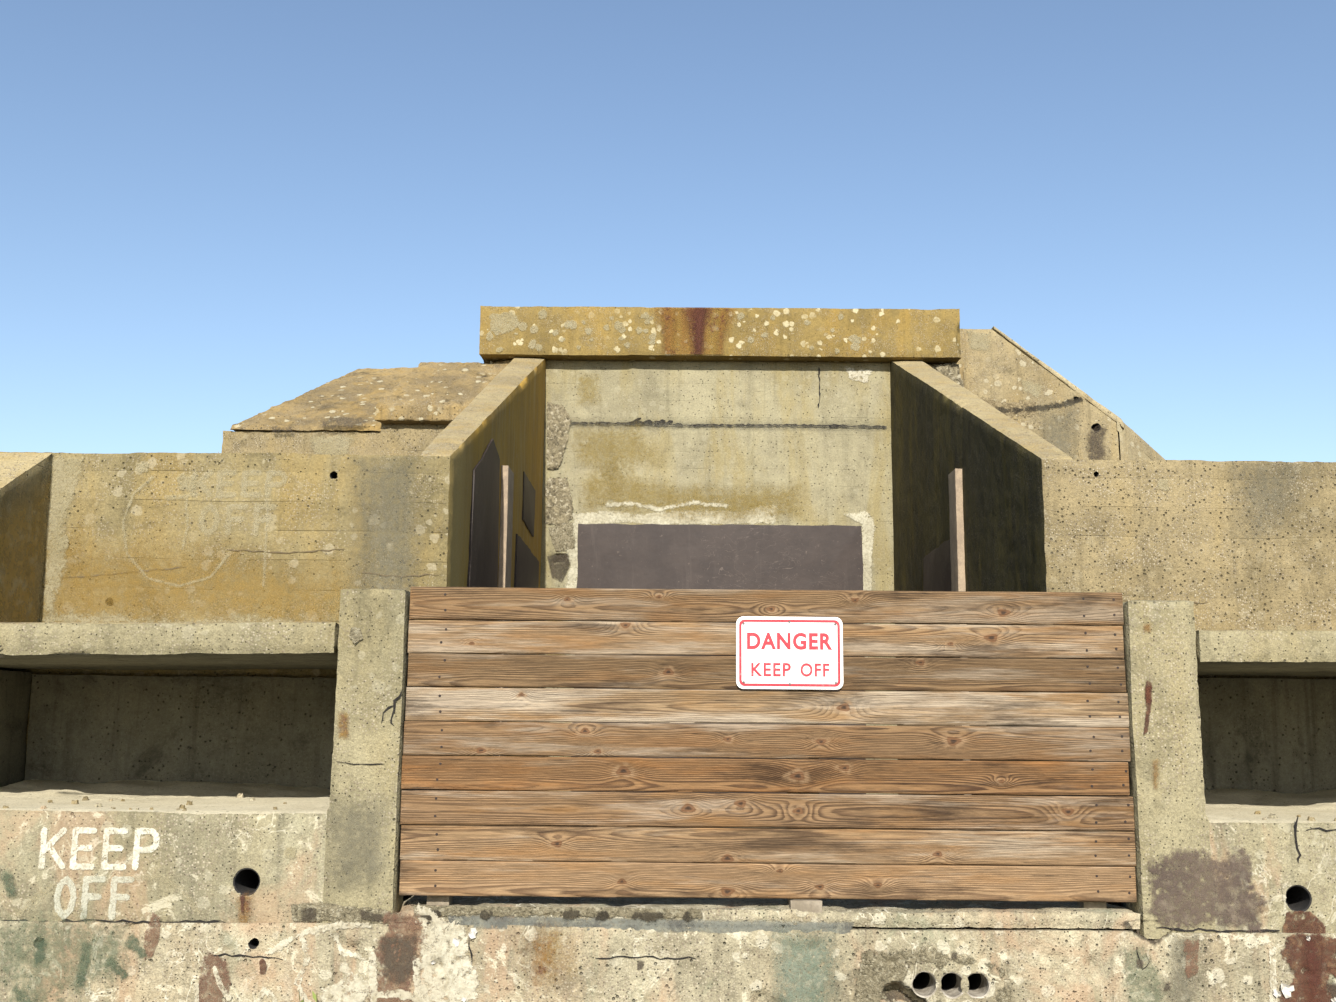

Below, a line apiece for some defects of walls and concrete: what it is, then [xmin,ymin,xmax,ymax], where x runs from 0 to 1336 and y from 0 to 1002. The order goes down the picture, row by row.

rust [655,307,733,354]
leakage [1089,427,1106,460]
spalling [544,402,575,582]
crack [1294,817,1336,863]
rust [1273,911,1336,1002]